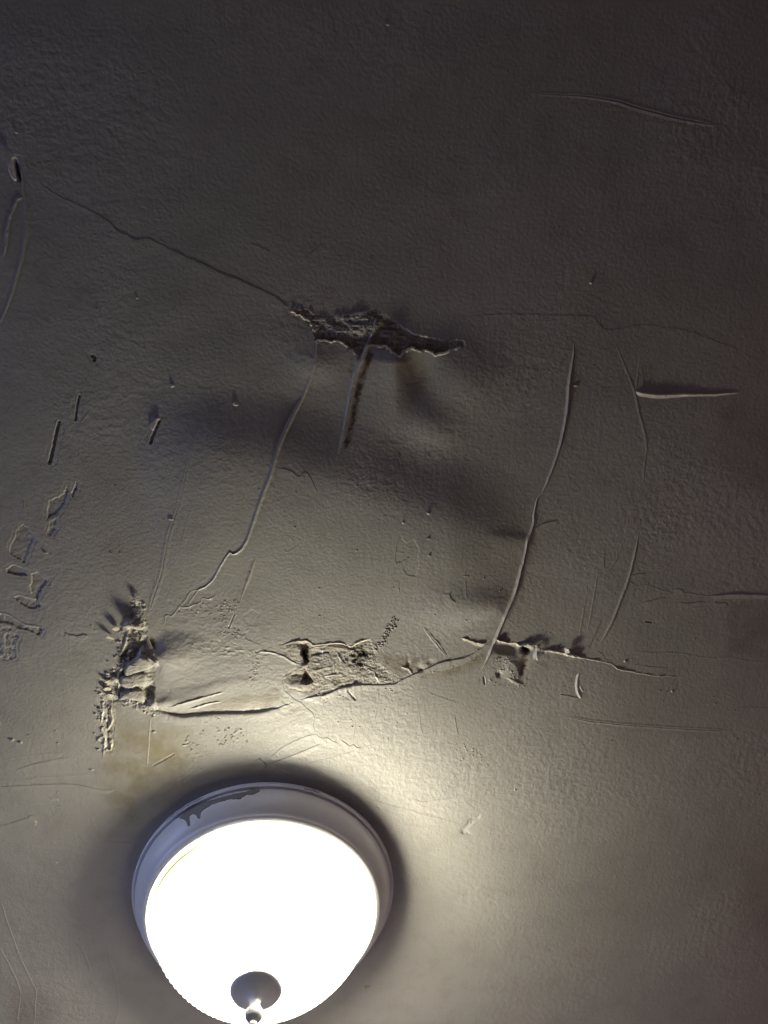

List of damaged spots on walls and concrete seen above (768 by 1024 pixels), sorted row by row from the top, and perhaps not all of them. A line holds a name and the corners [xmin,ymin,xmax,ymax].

spalling [286,304,467,362]
peeling [44,479,81,539]
crack [147,310,575,761]
peeling [0,562,52,664]
spalling [179,601,690,706]
crack [596,528,640,662]